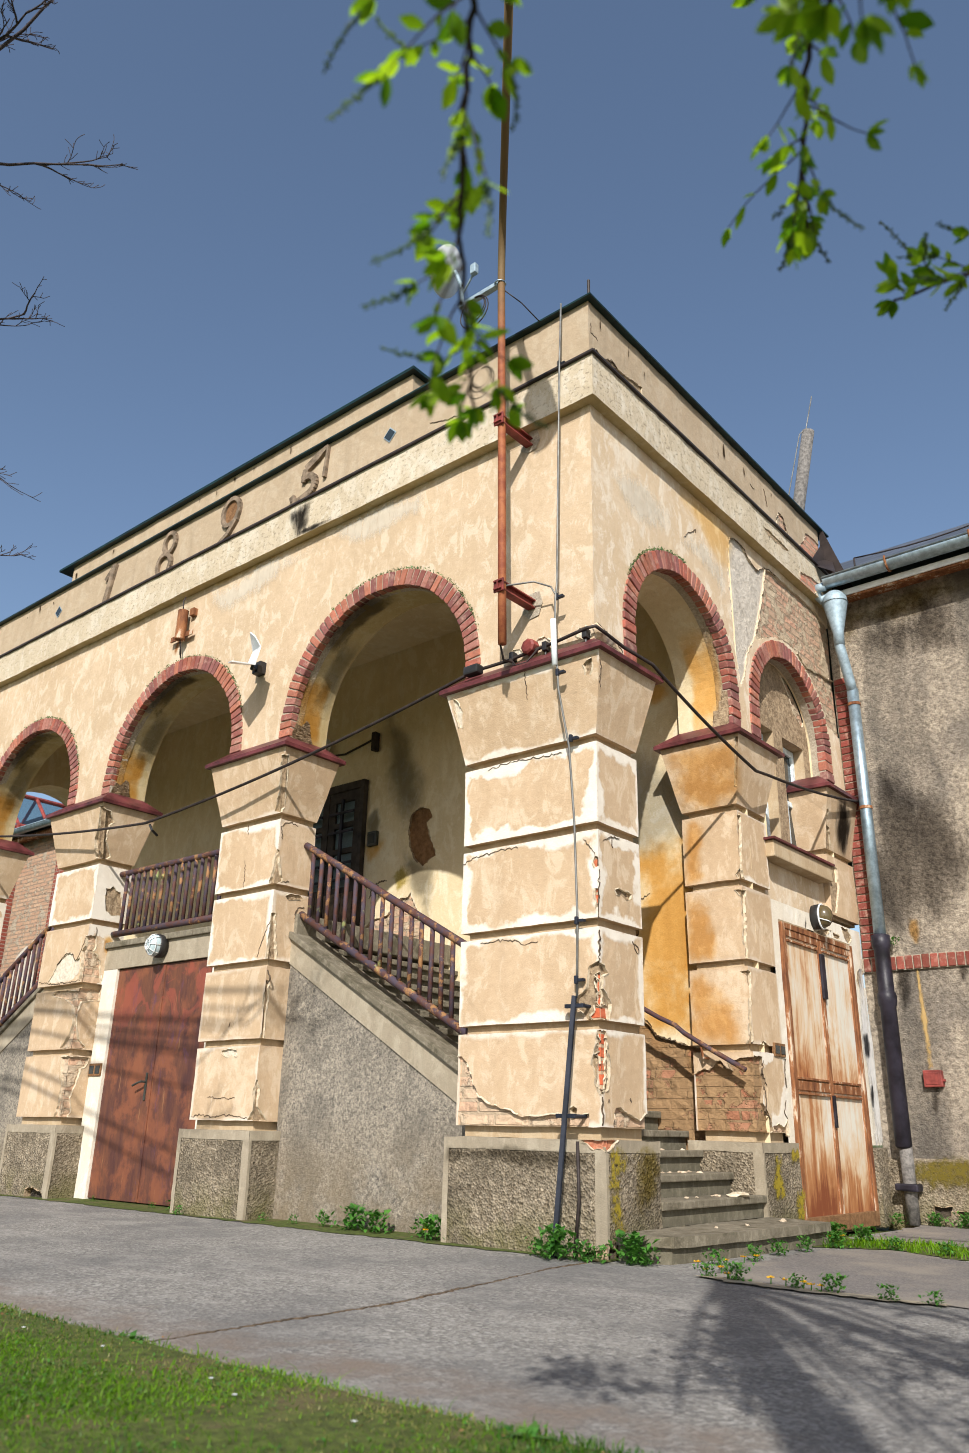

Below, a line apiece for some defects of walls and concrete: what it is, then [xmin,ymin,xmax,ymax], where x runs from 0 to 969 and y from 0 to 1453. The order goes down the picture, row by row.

spalling [713,514,838,787]
crack [488,752,561,771]
spalling [408,807,436,866]
crack [585,836,650,960]
spalling [48,935,102,1117]
spalling [456,814,790,1152]
crack [644,1018,686,1045]